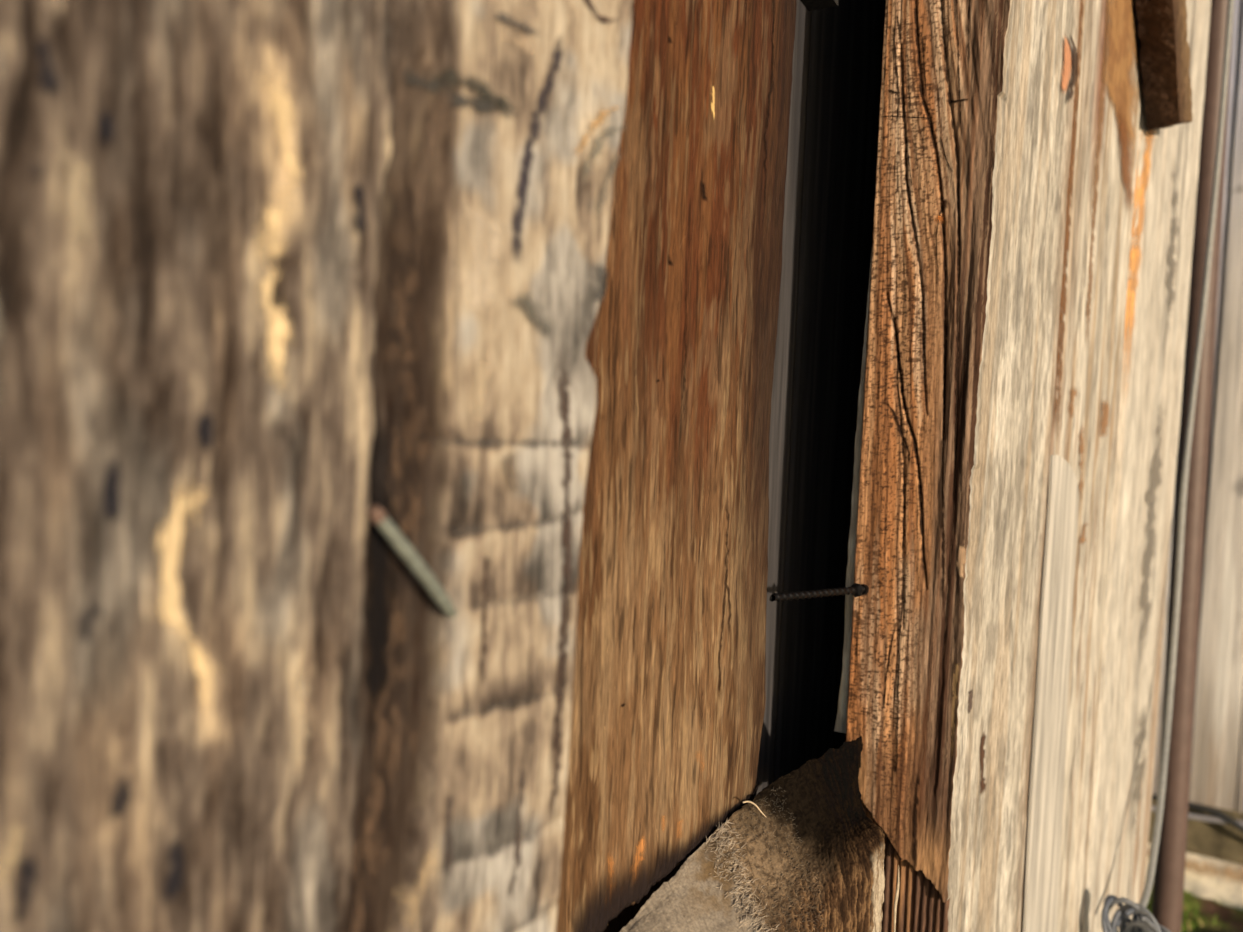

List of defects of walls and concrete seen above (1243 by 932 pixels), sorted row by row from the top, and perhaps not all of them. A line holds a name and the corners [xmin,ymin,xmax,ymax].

crack [862,0,971,891]
rust [1124,129,1153,350]